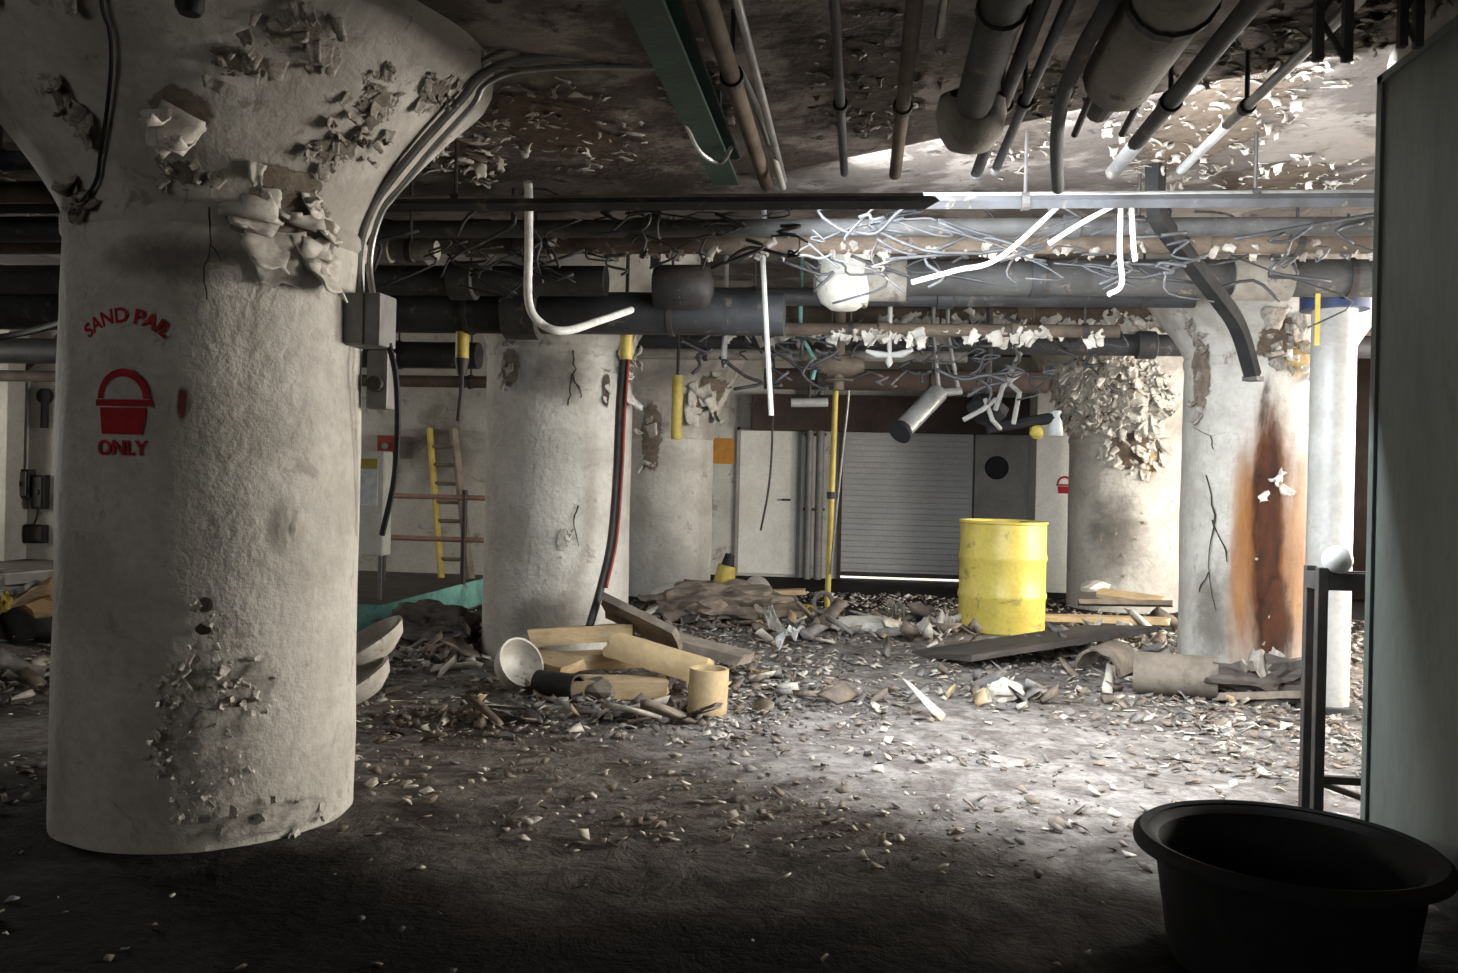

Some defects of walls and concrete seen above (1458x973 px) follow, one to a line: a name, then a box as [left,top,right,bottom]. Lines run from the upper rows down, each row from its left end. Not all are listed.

peeling [44,74,93,152]
peeling [136,1,466,303]
peeling [422,76,648,189]
peeling [1101,0,1453,191]
peeling [1039,318,1210,482]
rust [1233,385,1305,659]
spalling [142,597,326,842]